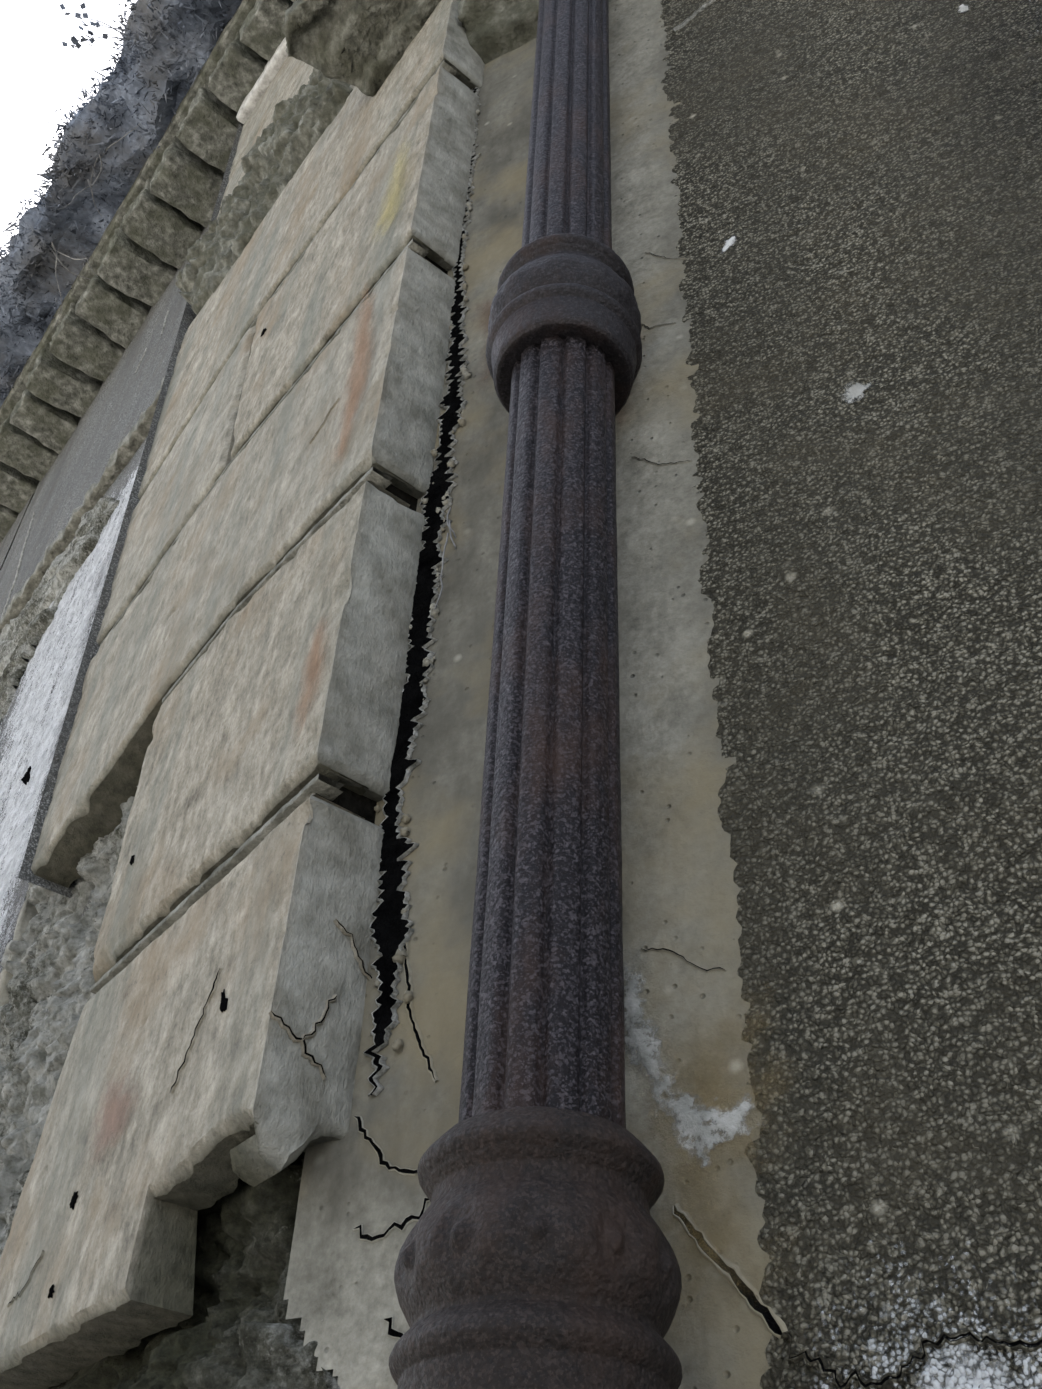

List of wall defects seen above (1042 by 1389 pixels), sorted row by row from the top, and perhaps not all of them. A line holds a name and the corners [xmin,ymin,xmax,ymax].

peeling [0,496,120,729]
leakage [0,438,146,973]
crack [269,74,483,1243]
spalling [0,786,138,1257]
spalling [220,989,228,1012]
peeling [624,965,753,1167]
spalling [47,1152,340,1389]
crack [383,1316,404,1339]
crack [672,1203,1042,1389]
leakage [845,1263,1042,1389]